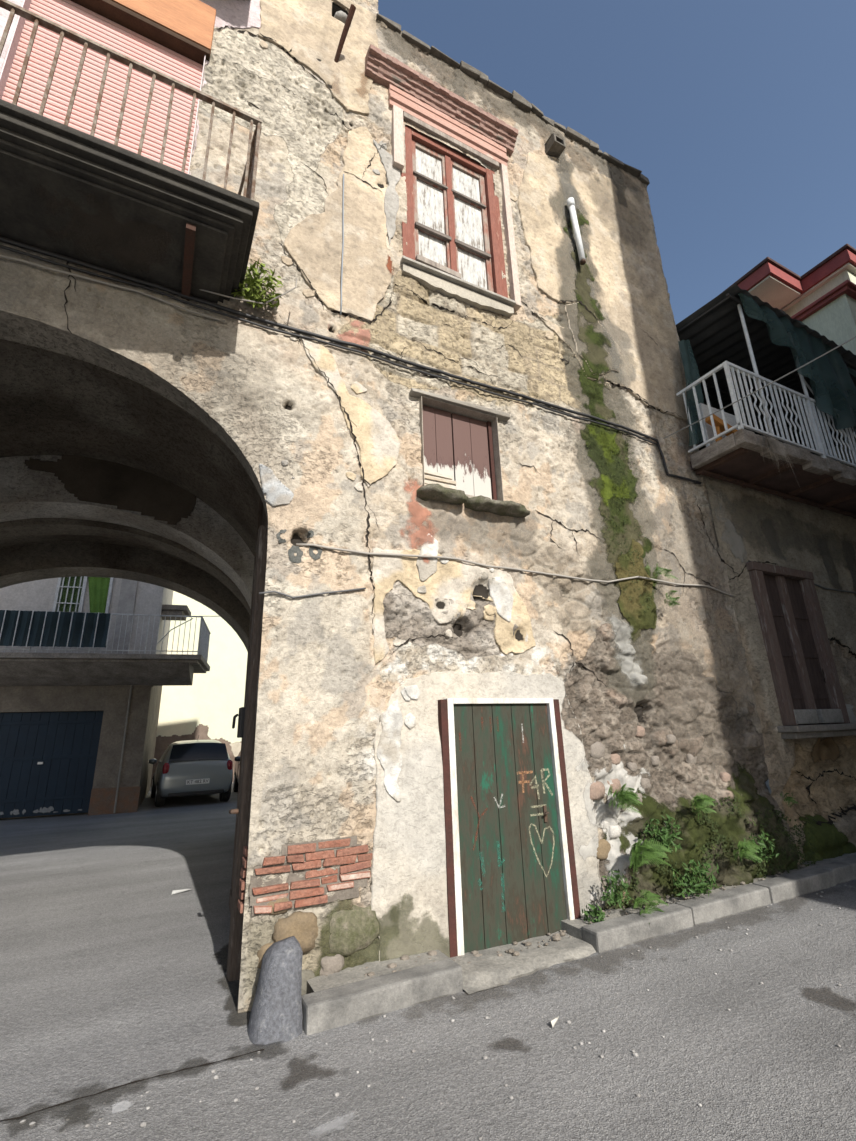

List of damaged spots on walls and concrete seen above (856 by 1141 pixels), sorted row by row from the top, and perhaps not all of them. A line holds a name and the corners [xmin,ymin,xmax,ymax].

peeling [200,0,688,421]
crack [64,262,76,334]
crack [279,315,379,635]
peeling [290,333,400,492]
damp [550,132,662,704]
crack [393,634,473,653]
peeling [372,534,536,664]
crack [829,637,856,658]
crack [796,769,856,826]
flaking render [237,835,380,996]